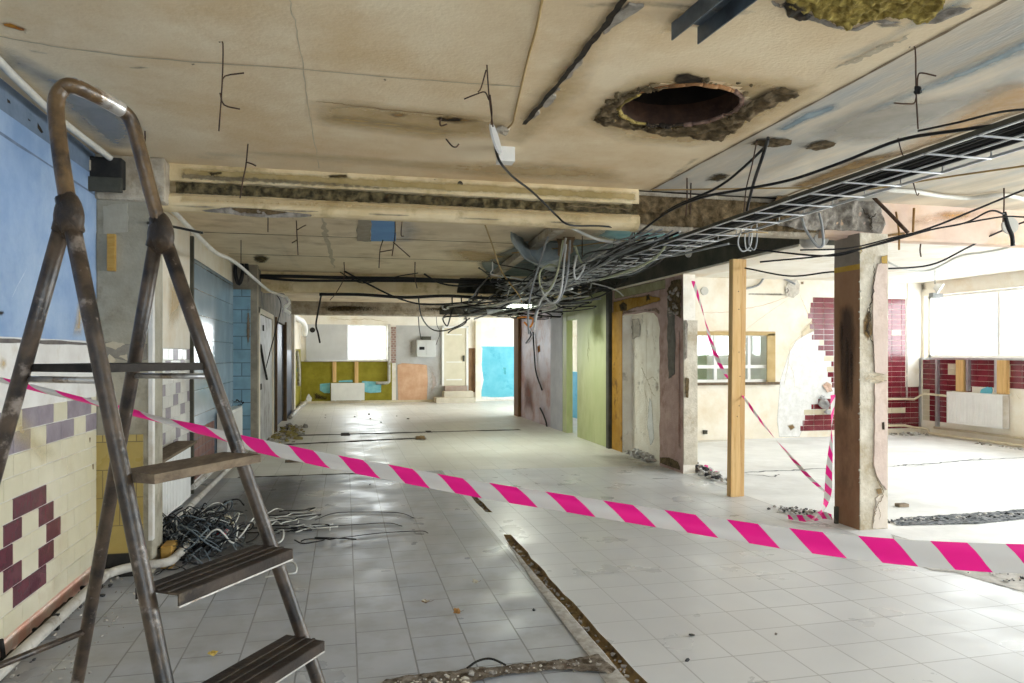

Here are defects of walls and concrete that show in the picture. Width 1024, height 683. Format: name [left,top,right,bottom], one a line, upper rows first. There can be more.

spalling [771,0,972,31]
spalling [594,85,799,142]
spalling [633,190,788,228]
spalling [747,198,910,234]
flaking render [777,329,834,437]